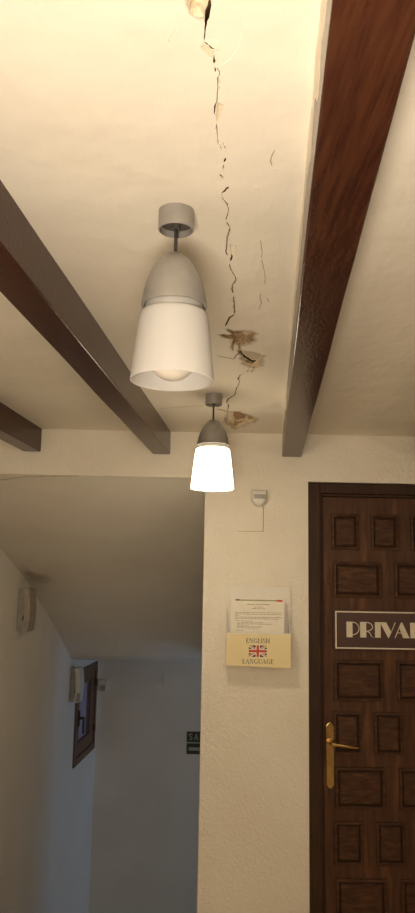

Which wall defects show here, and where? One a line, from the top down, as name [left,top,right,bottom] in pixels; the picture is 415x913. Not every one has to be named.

flaking render [188,0,220,58]
crack [205,42,237,326]
flaking render [220,329,264,371]
crack [225,369,252,411]
flaking render [217,405,255,429]